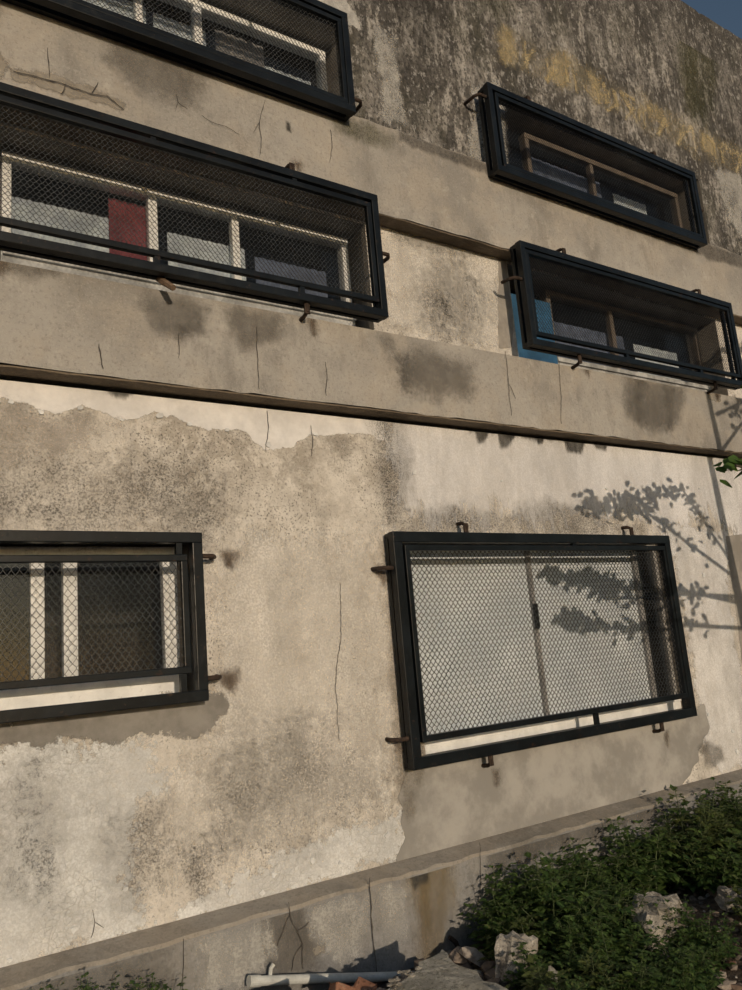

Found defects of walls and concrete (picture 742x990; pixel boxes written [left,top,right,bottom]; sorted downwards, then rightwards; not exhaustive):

crack [13,48,124,110]
leakage [715,142,742,236]
peeling [0,380,742,774]
peeling [0,735,405,968]
leakage [381,873,428,934]